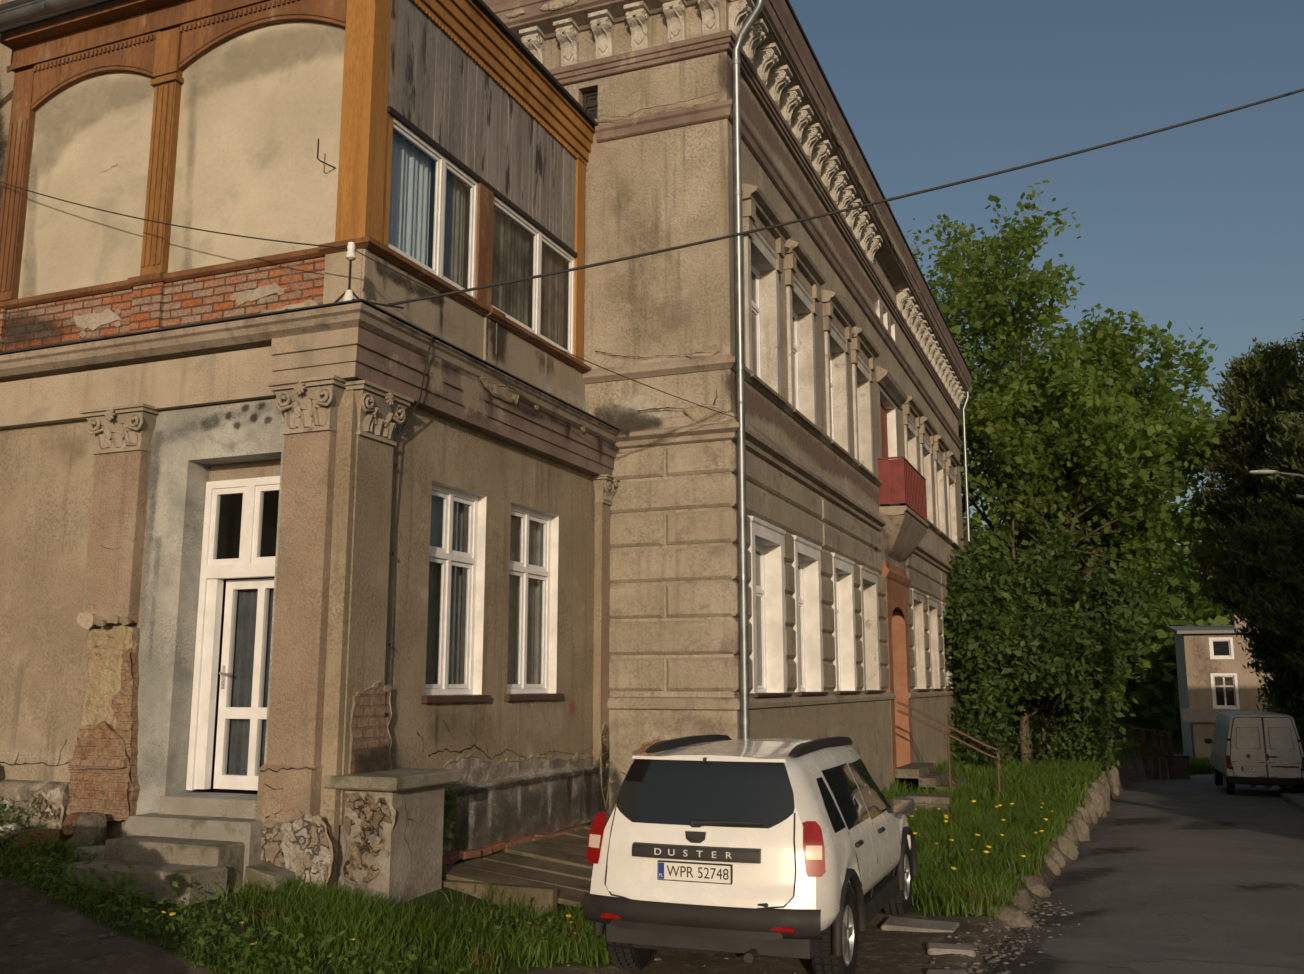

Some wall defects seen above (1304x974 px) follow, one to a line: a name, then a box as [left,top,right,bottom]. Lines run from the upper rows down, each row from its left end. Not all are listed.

peeling [28,612,140,824]
peeling [348,679,392,774]
crack [417,720,592,762]
spalling [341,790,396,886]